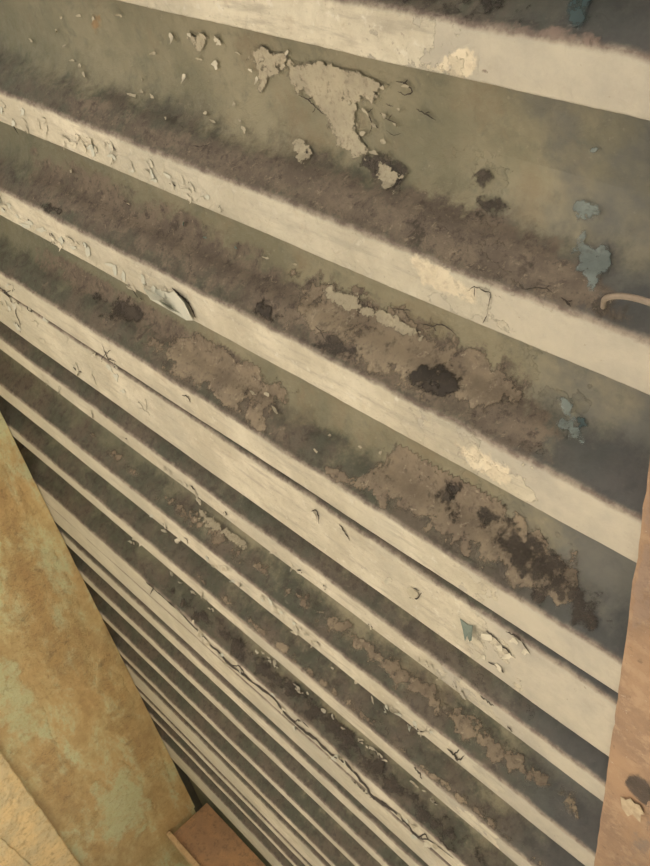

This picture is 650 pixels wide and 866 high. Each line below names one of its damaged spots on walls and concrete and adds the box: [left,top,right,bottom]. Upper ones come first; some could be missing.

peeling [235,46,404,194]
peeling [0,193,91,257]
peeling [105,263,196,321]
damp [253,299,277,321]
damp [408,364,463,397]
damp [446,482,463,500]
peeling [460,619,530,673]
crack [146,582,454,858]